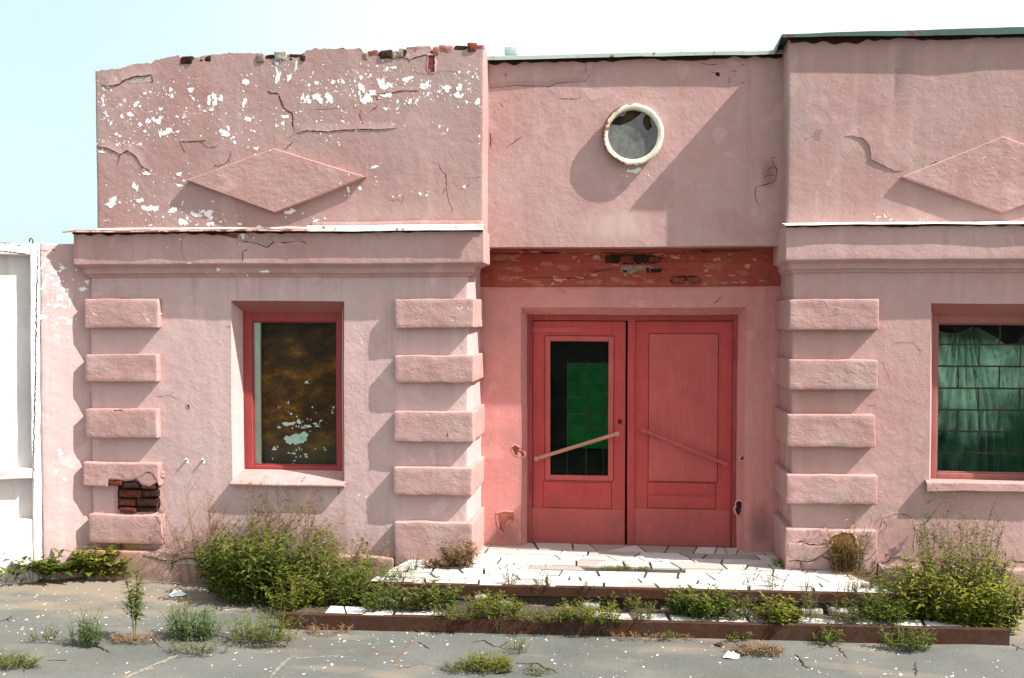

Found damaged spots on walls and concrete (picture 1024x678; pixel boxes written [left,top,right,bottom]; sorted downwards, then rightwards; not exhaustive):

crack [101,63,157,87]
crack [267,46,441,150]
crack [95,140,151,171]
crack [179,135,232,167]
peeling [94,41,484,245]
crack [239,234,305,260]
flaking render [493,250,767,290]
flaking render [510,444,526,458]
flaking render [109,480,166,515]
flaking render [495,510,516,534]